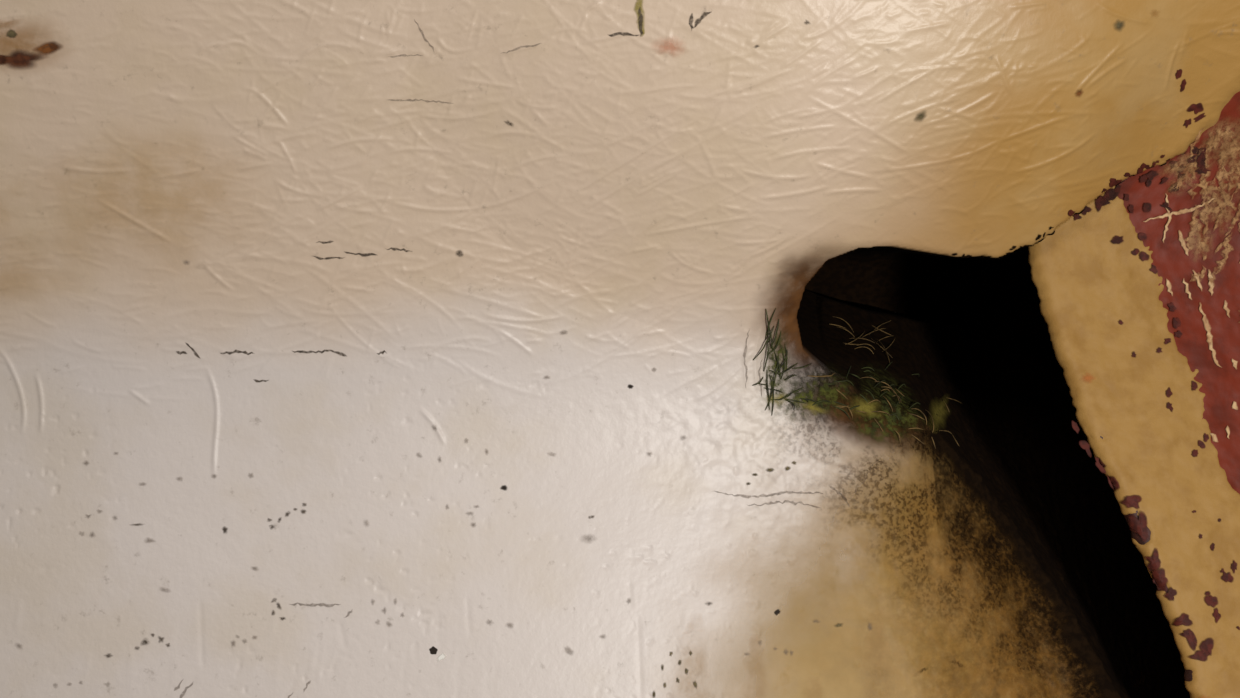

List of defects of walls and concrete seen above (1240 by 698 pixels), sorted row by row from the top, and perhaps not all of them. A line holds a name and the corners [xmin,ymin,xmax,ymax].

corrosion [0,30,60,67]
peeling [1183,103,1206,128]
peeling [1068,147,1212,220]
peeling [933,227,1052,258]
peeling [1111,233,1158,274]
peeling [1157,303,1182,353]
peeling [1192,433,1209,457]
peeling [1072,421,1177,601]
water stain [745,428,1091,698]
peeling [1220,560,1237,582]
peeling [1205,591,1221,623]
peeling [1172,613,1214,661]